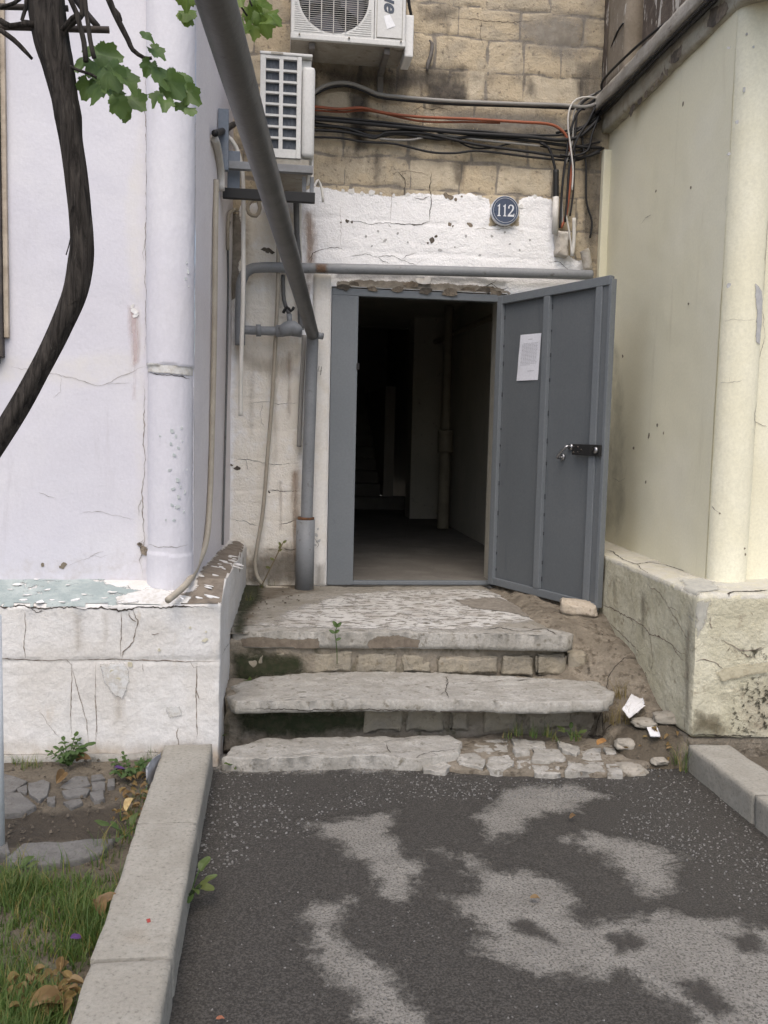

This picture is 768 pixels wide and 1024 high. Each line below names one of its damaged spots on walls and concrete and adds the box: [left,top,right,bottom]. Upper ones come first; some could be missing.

crack [310,171,432,265]
spalling [337,276,510,296]
peeling [755,284,763,344]
crack [0,223,228,745]
peeling [0,541,244,612]
crack [588,550,765,738]